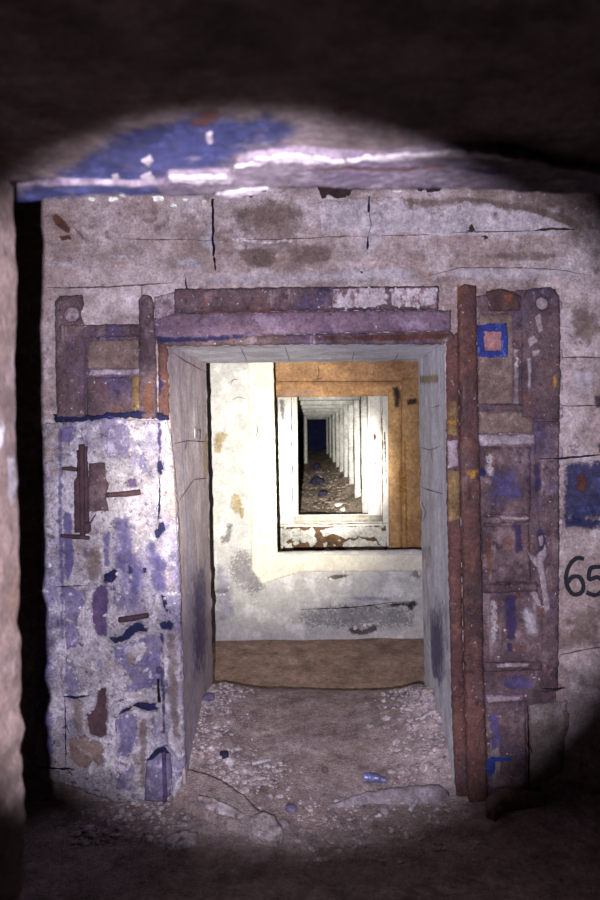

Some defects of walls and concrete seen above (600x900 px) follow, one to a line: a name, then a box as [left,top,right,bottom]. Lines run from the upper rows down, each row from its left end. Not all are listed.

spalling [17,141,600,239]
crack [135,199,216,271]
leakage [237,203,302,225]
crack [245,196,428,250]
crack [454,226,575,234]
rust [304,333,448,341]
crack [537,453,598,461]
peeling [279,524,387,552]